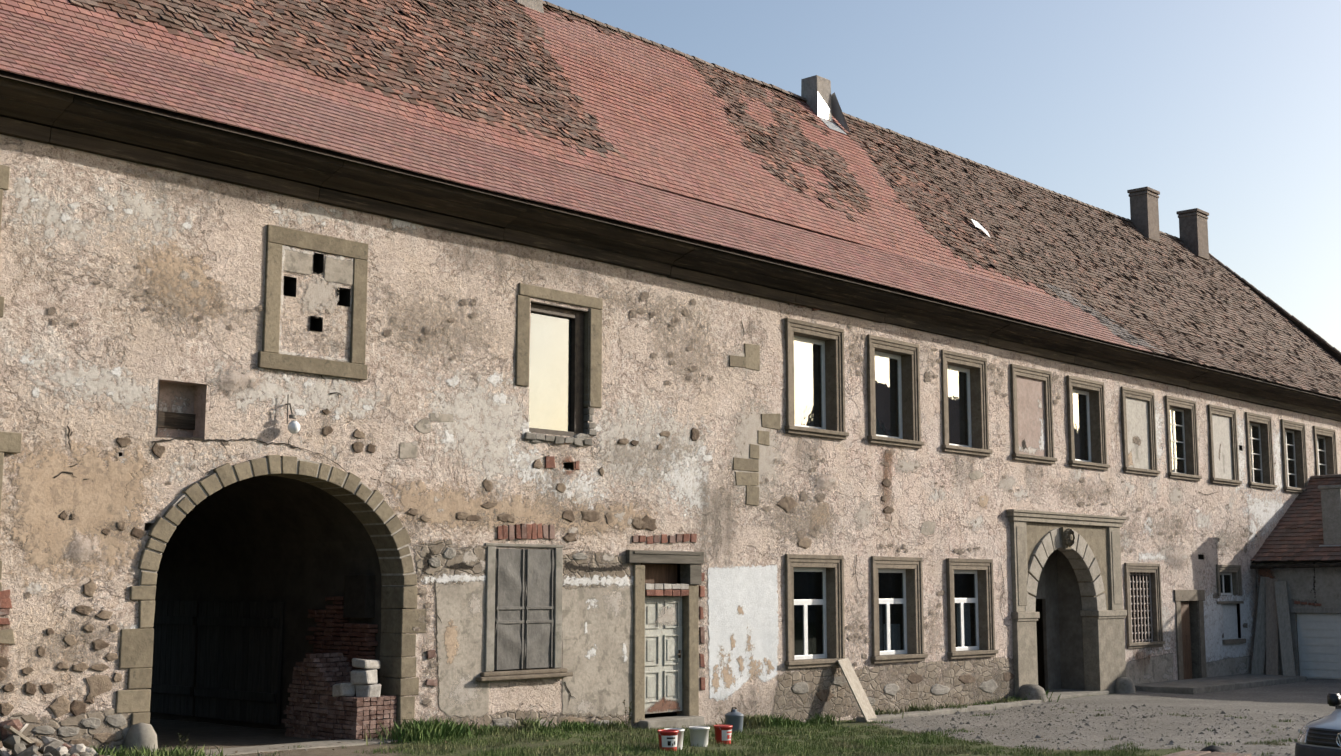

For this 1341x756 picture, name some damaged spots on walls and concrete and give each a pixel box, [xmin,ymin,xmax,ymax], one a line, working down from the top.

flaking render [384,317,430,342]
flaking render [449,298,479,323]
flaking render [0,341,391,753]
crack [152,437,348,473]
flaking render [391,344,832,631]
peeling [699,564,1015,720]